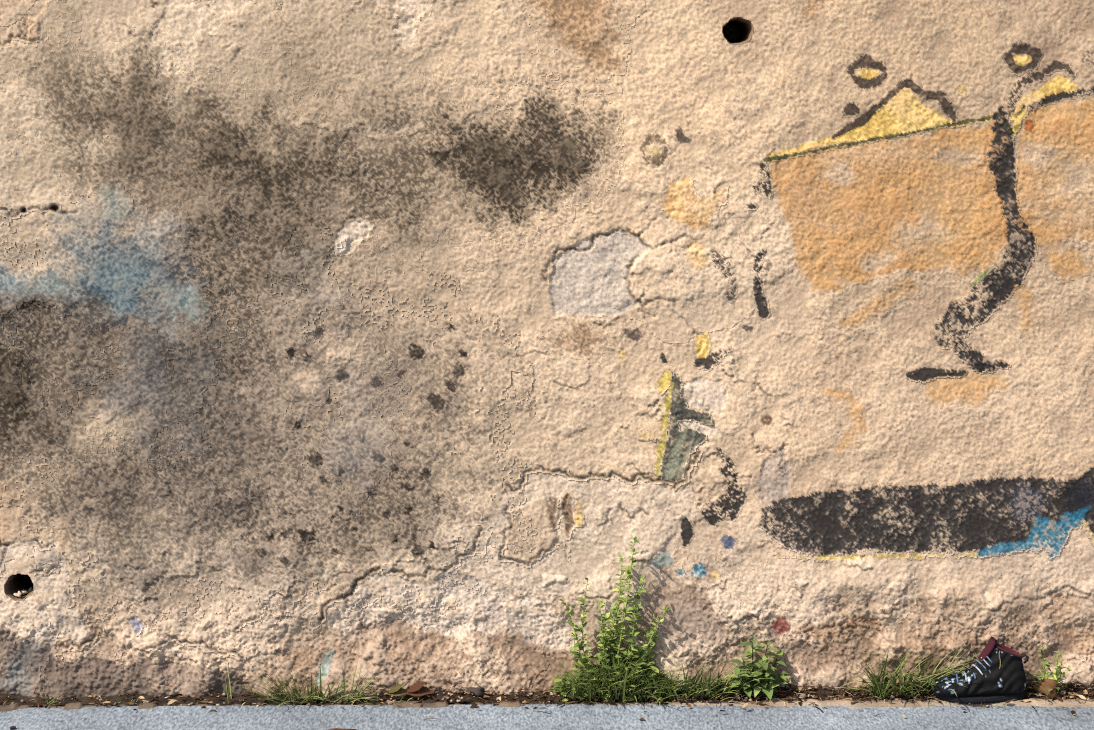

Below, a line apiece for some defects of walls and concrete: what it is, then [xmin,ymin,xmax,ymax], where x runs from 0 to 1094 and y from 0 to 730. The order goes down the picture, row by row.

crack [0,203,65,219]
flaking render [548,230,632,318]
water stain [0,0,629,706]
crack [0,538,75,608]
crack [317,449,703,632]
crack [58,626,105,651]
crack [143,615,261,660]